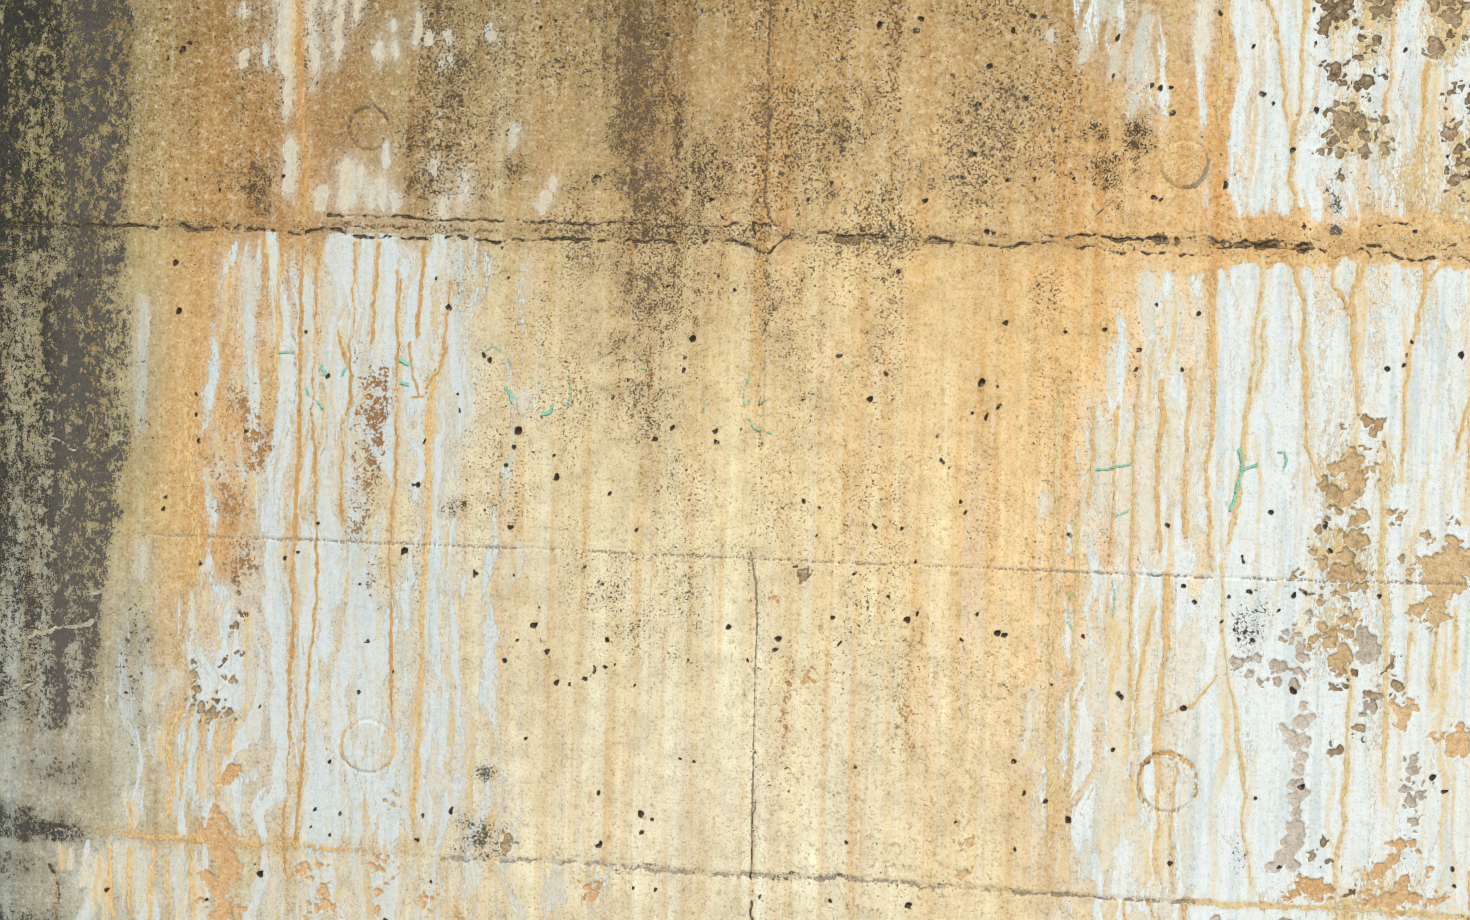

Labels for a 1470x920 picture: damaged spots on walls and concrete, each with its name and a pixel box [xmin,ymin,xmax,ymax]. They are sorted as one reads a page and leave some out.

corrosion [181,289,203,614]
corrosion [226,0,373,916]
water stain [0,0,610,920]
corrosion [338,241,451,832]
crack [15,197,1470,262]
corrosion [1045,0,1470,920]
spalling [1229,413,1470,920]
spalling [1311,0,1397,182]
spalling [1421,0,1470,60]
spalling [1440,79,1470,202]